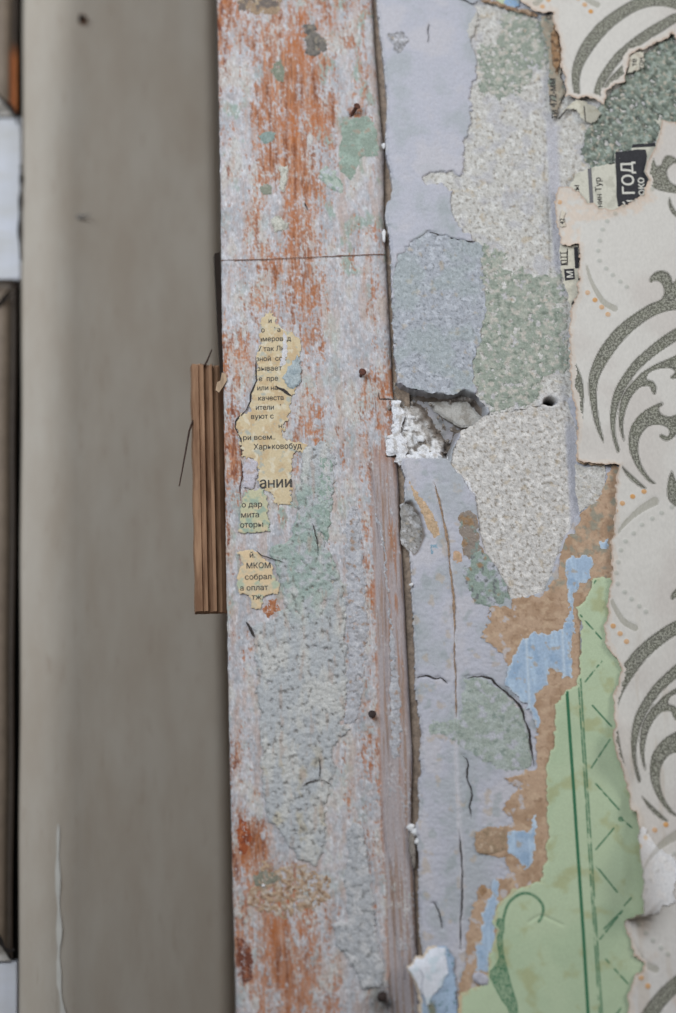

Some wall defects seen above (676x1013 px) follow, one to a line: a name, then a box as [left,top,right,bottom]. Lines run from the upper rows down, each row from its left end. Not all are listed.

peeling [303,23,327,56]
peeling [278,165,289,192]
flaking render [386,1,676,598]
peeling [242,458,258,489]
flaking render [247,440,369,920]
flaking render [375,513,403,759]
peeling [638,827,676,917]